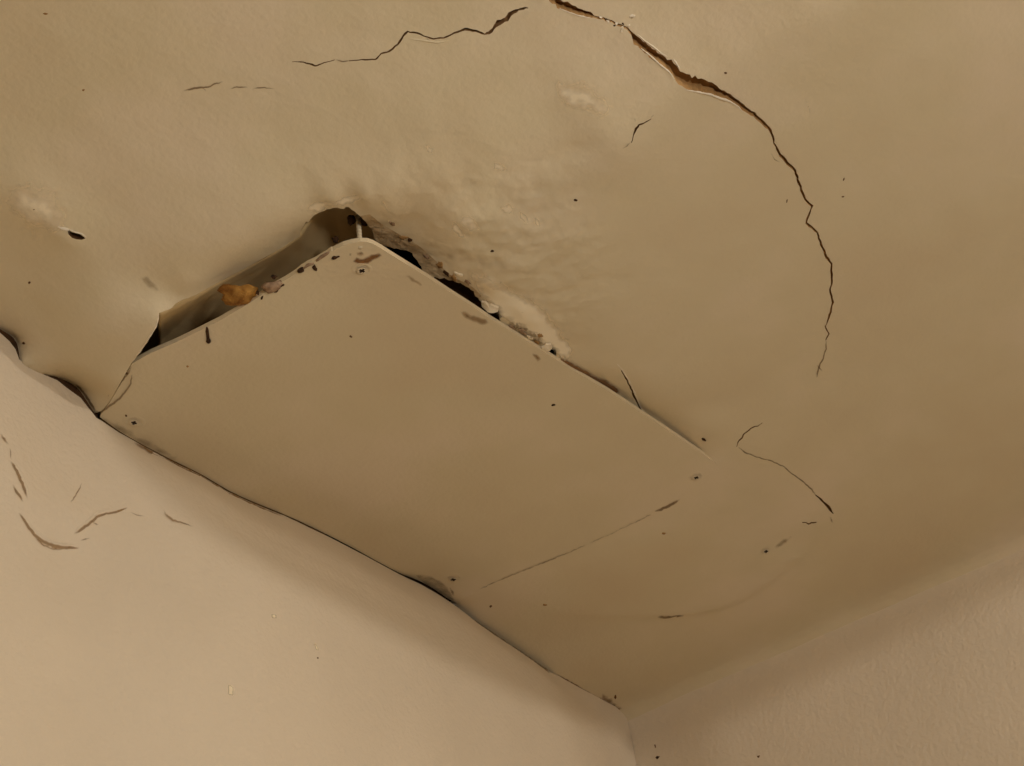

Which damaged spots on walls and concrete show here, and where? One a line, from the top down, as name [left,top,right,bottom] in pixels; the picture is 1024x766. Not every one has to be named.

flaking render [360,214,499,313]
flaking render [417,175,589,258]
crack [293,0,834,374]
crack [0,329,20,359]
flaking render [509,325,564,360]
crack [46,370,450,602]
crack [737,423,833,525]